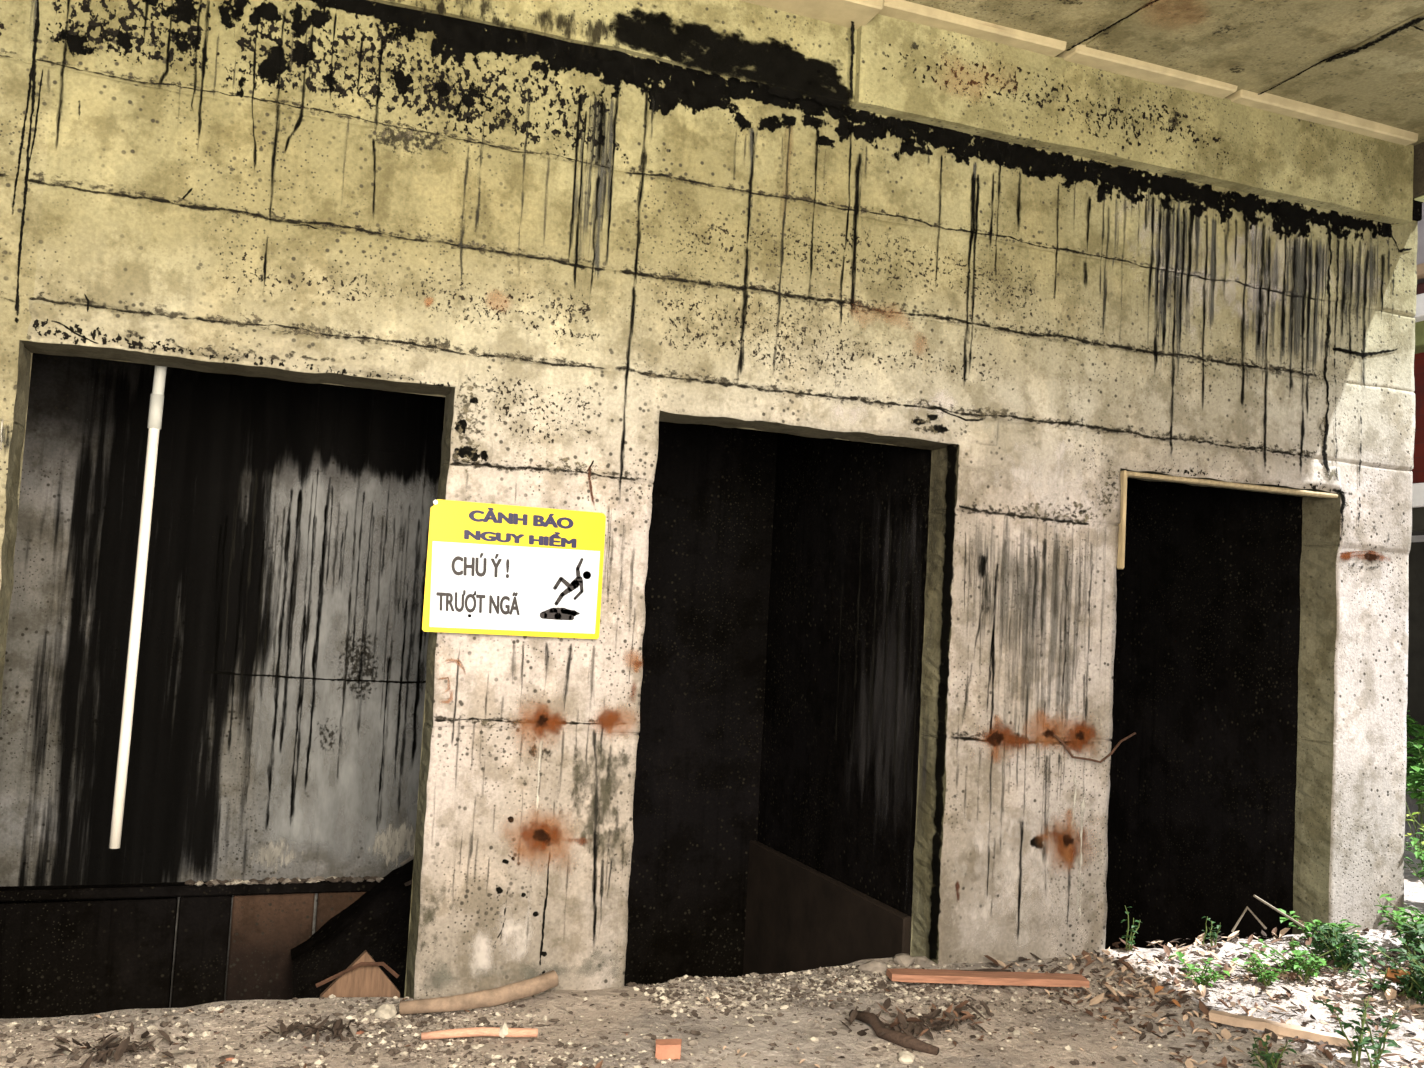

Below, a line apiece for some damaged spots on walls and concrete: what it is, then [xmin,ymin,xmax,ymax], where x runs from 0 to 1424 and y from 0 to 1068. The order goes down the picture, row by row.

crack [0,0,1397,547]
water stain [46,0,1395,489]
water stain [17,365,445,902]
water stain [1016,540,1092,718]
rust [528,711,561,734]
rust [599,712,622,730]
water stain [1017,695,1046,803]
rust [987,715,1095,758]
rust [519,820,585,854]
rust [1030,817,1084,864]